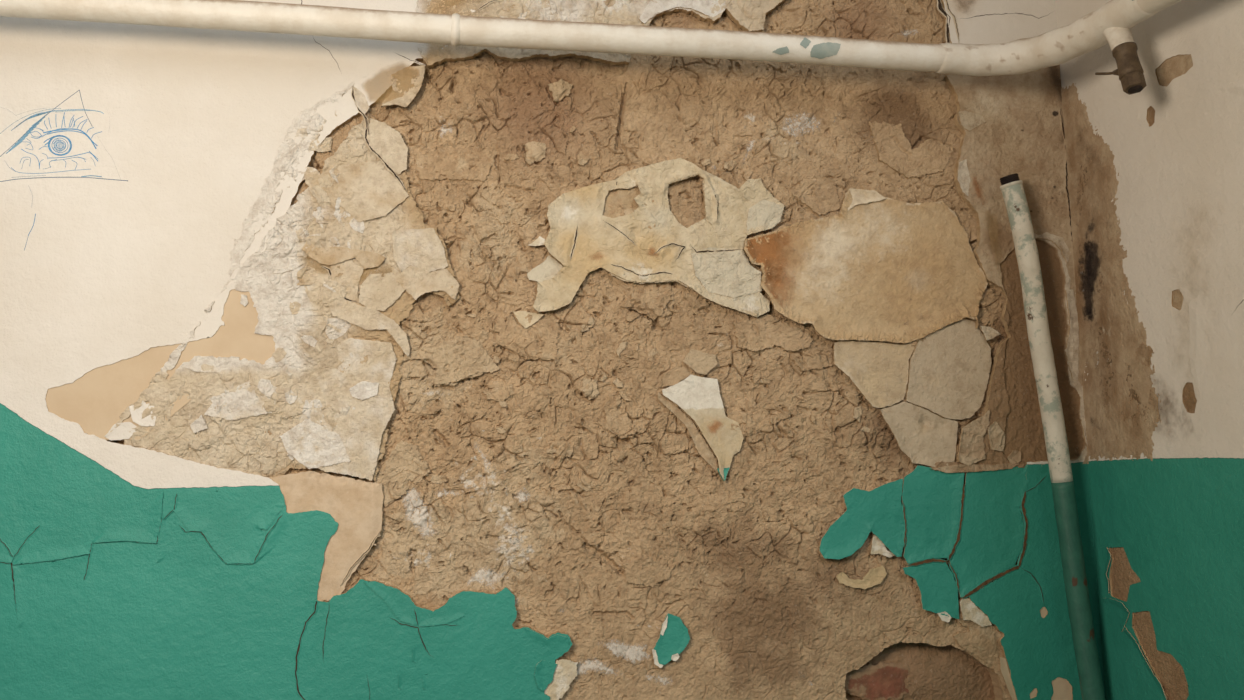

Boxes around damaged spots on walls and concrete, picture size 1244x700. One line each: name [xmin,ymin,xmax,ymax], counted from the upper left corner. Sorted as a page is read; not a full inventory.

spalling [415,0,946,59]
peeling [1157,54,1193,86]
leakage [928,65,1166,473]
spalling [0,43,1030,700]
crack [0,562,18,620]
crack [294,600,330,700]
crack [389,610,457,657]
crack [902,476,1046,606]
peeling [1051,677,1072,700]
peeling [1100,547,1189,700]